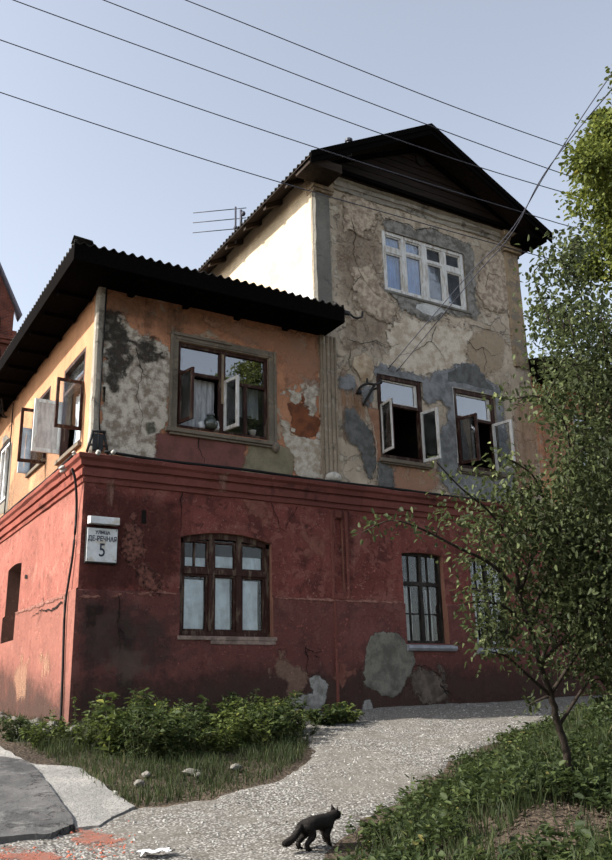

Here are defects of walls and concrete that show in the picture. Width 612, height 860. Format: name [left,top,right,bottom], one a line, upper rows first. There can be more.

crack [385,218,470,245]
crack [348,327,445,367]
peeling [100,314,170,458]
peeling [203,316,323,478]
peeling [393,466,439,492]
spalling [410,664,449,705]